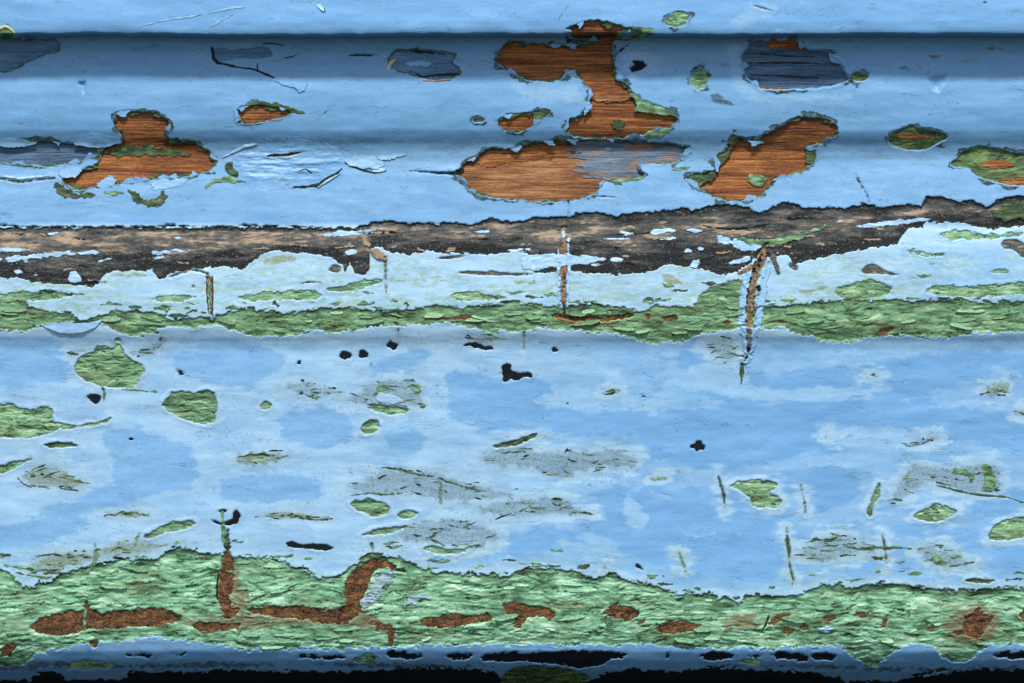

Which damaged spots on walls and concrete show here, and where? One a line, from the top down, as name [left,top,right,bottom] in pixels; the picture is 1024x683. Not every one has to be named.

peeling [0,12,1024,425]
crack [557,199,571,316]
crack [703,224,780,384]
peeling [0,404,111,448]
peeling [0,498,1024,683]